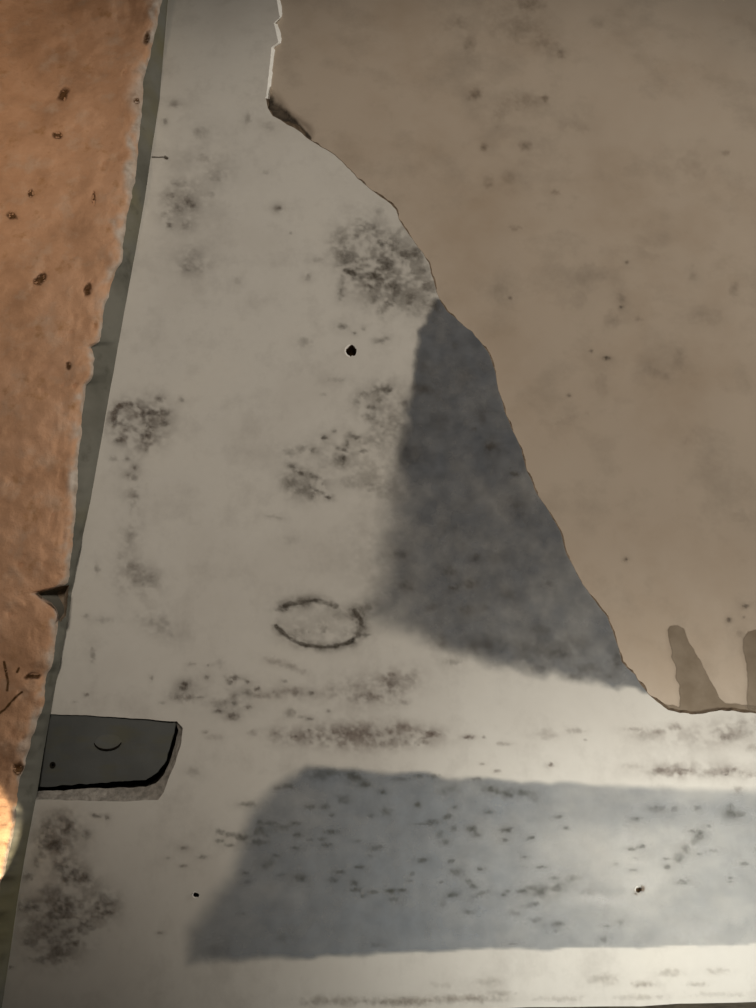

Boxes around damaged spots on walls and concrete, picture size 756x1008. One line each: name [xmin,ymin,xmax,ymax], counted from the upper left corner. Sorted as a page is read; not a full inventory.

water stain [275,625,354,648]
flaking render [266,0,756,714]